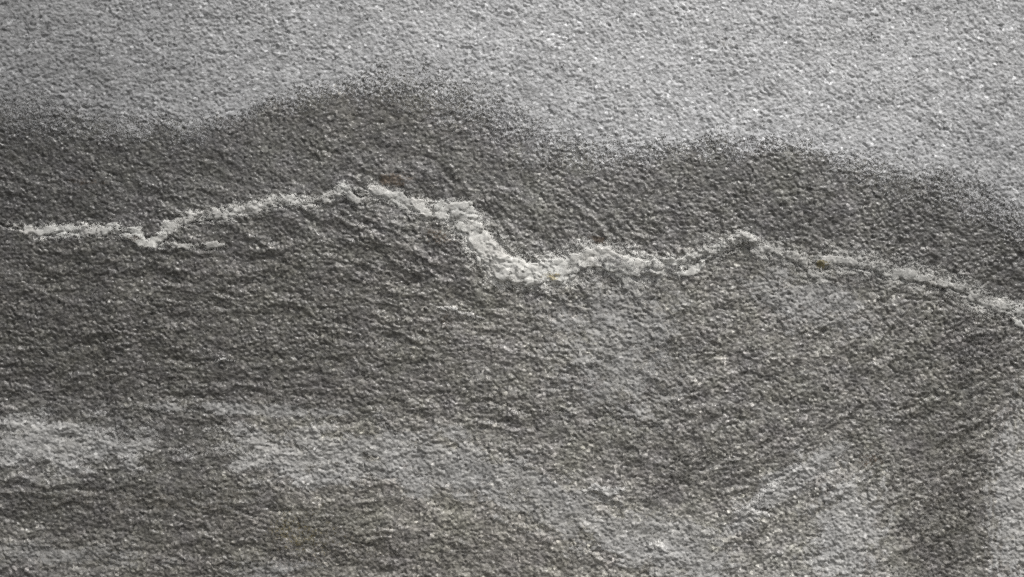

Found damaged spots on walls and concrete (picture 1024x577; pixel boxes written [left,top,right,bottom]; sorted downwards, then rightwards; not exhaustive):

crack [910,281,968,332]